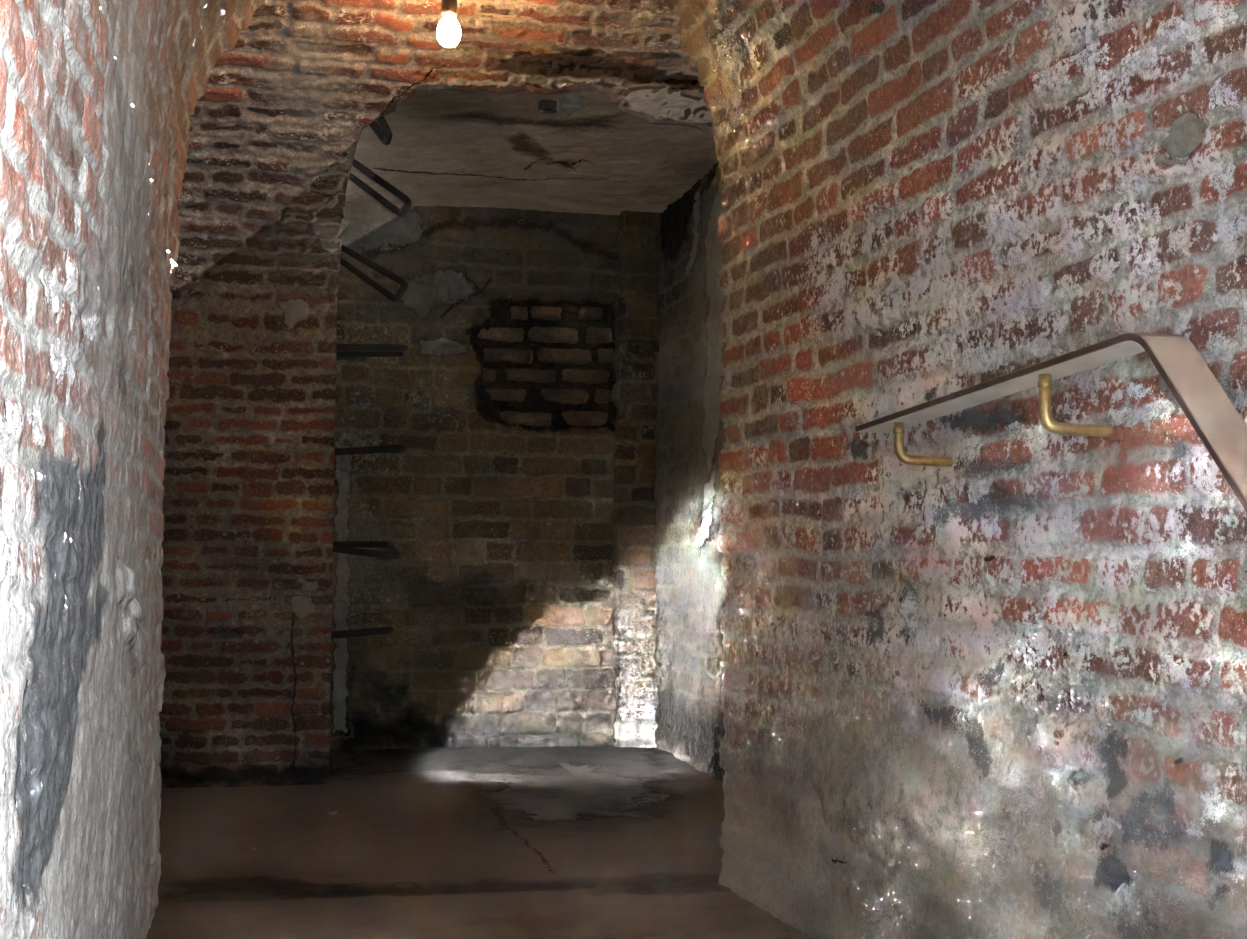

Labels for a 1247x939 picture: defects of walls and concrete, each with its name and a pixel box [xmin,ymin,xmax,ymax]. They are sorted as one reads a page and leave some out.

leakage [97,418,106,490]
leakage [96,577,108,641]
crack [286,613,298,767]